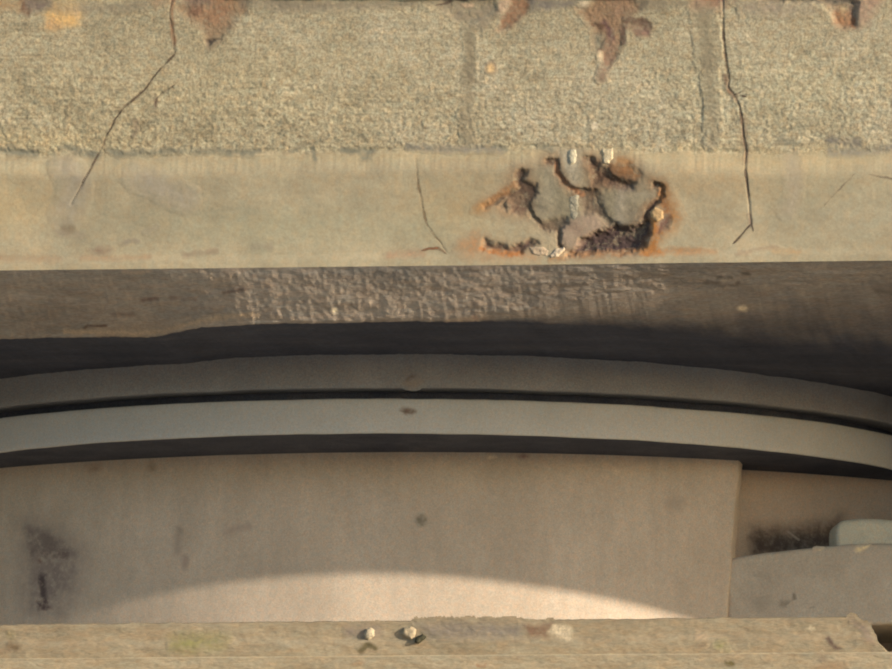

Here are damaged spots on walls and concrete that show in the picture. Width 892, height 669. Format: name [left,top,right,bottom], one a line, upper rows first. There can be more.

crack [73,0,178,200]
crack [415,160,446,254]
spalling [451,121,703,266]
crack [722,28,754,244]